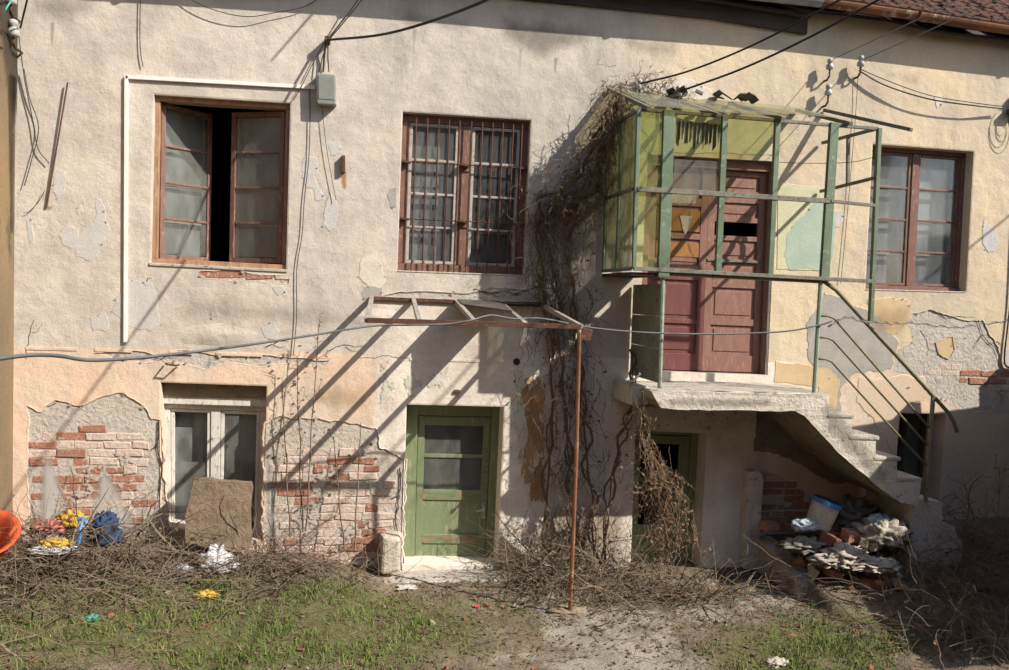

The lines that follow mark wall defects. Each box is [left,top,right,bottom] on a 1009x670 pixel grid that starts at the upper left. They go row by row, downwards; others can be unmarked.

spalling [24,392,170,544]
spalling [260,415,407,570]
peeling [511,369,529,465]
spalling [773,292,1009,454]
crack [920,310,1001,369]